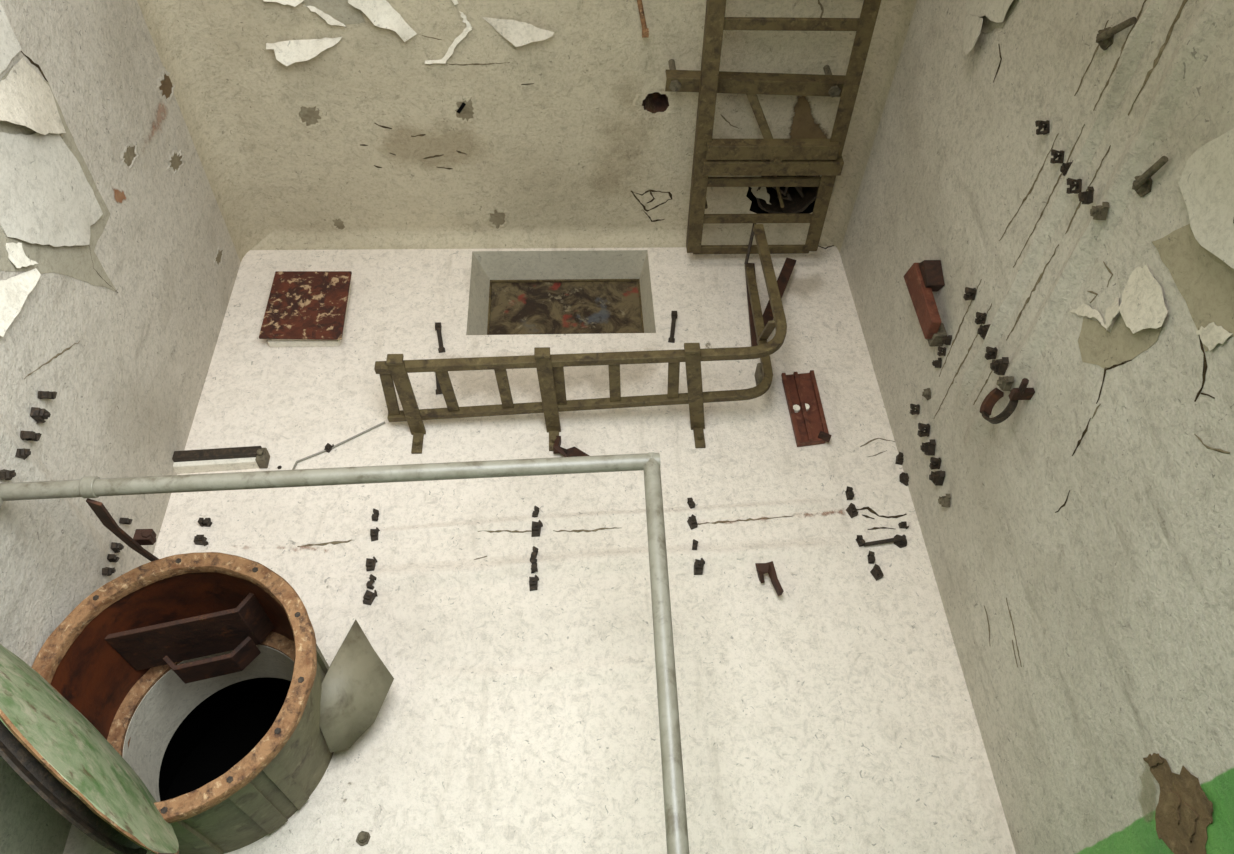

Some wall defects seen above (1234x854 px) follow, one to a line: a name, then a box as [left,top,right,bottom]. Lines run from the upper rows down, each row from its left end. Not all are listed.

peeling [263,0,554,66]
peeling [962,0,1019,55]
crack [1128,0,1188,116]
peeling [0,4,118,337]
crack [934,0,1147,418]
peeling [1070,128,1234,369]
crack [1072,360,1132,456]
crack [1194,327,1214,402]
crack [1194,434,1231,454]